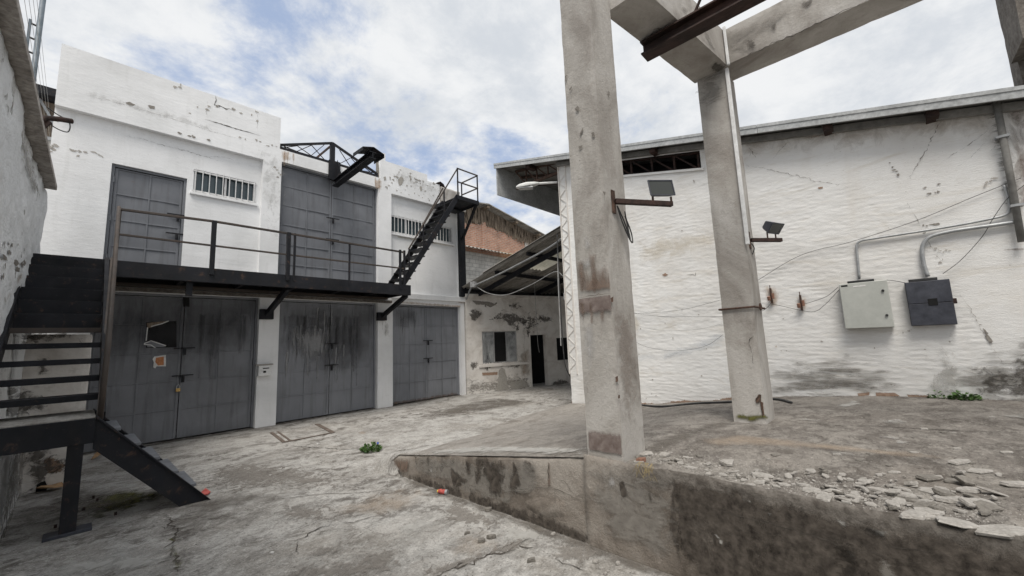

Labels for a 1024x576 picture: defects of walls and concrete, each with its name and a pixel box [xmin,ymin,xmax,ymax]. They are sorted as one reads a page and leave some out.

water stain [775,362,888,406]
water stain [933,354,1024,401]
water stain [396,446,670,576]
crack [154,512,181,572]